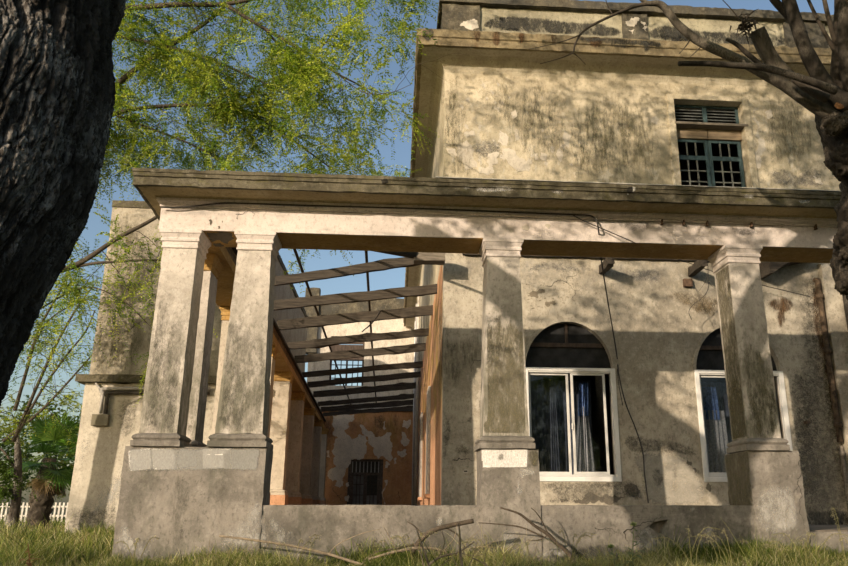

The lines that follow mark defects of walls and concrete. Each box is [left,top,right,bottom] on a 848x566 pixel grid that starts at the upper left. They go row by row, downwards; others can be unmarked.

damp [484,17,753,52]
peeling [625,17,647,34]
damp [576,107,654,171]
corrosion [770,297,792,326]
peeling [327,415,411,502]